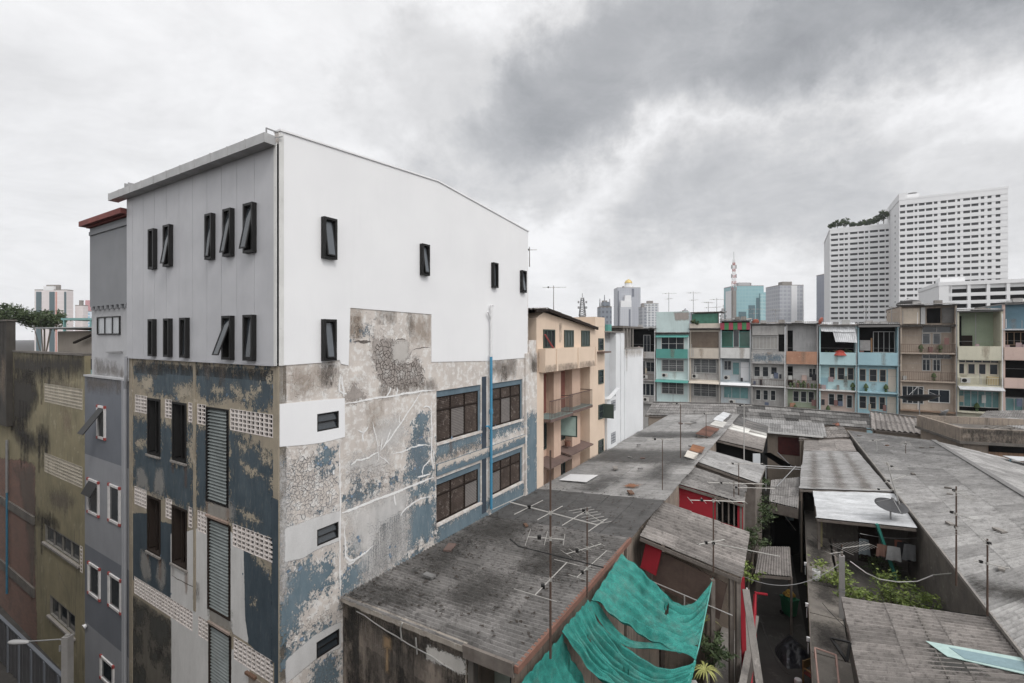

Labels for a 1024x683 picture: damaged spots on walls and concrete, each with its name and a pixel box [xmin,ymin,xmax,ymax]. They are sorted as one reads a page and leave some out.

damp [0,321,123,584]
peeling [133,360,273,413]
crack [281,323,435,593]
peeling [227,410,537,683]
spalling [349,318,425,391]